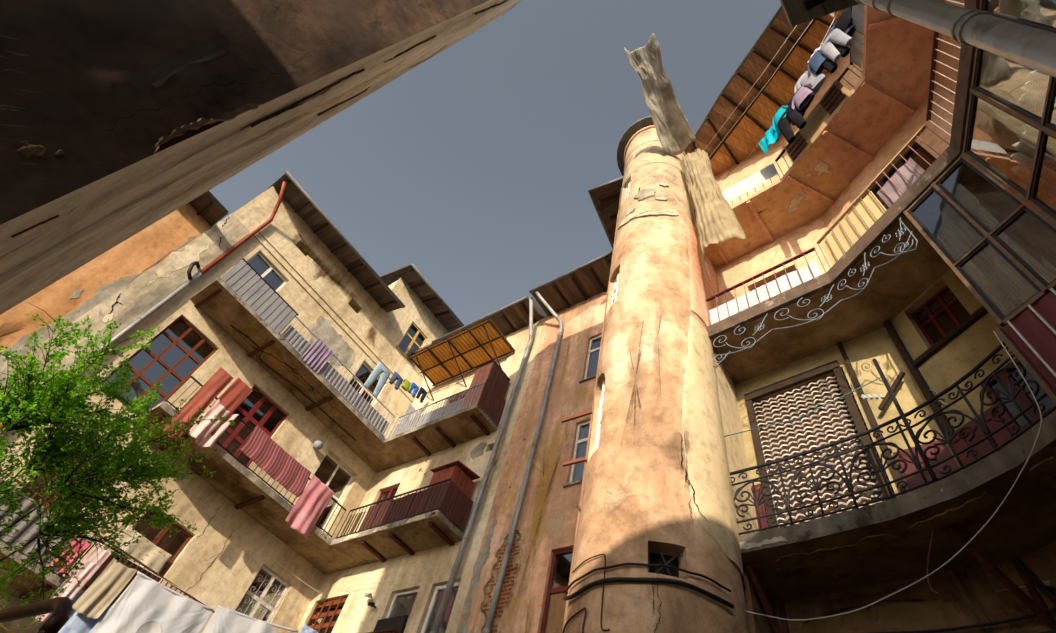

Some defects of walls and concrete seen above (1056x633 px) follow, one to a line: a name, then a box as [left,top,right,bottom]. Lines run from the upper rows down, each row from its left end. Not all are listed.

peeling [154,68,371,153]
peeling [618,183,679,230]
crack [680,434,707,525]
spalling [457,505,525,633]